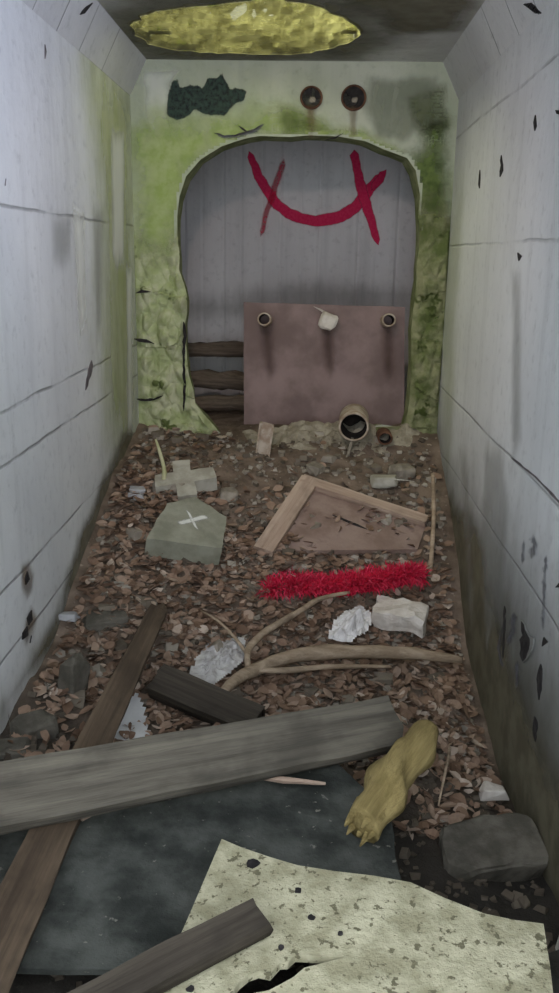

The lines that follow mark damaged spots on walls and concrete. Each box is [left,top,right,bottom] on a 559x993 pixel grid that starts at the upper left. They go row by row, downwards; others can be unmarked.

spalling [130,0,361,55]
leakage [370,81,431,137]